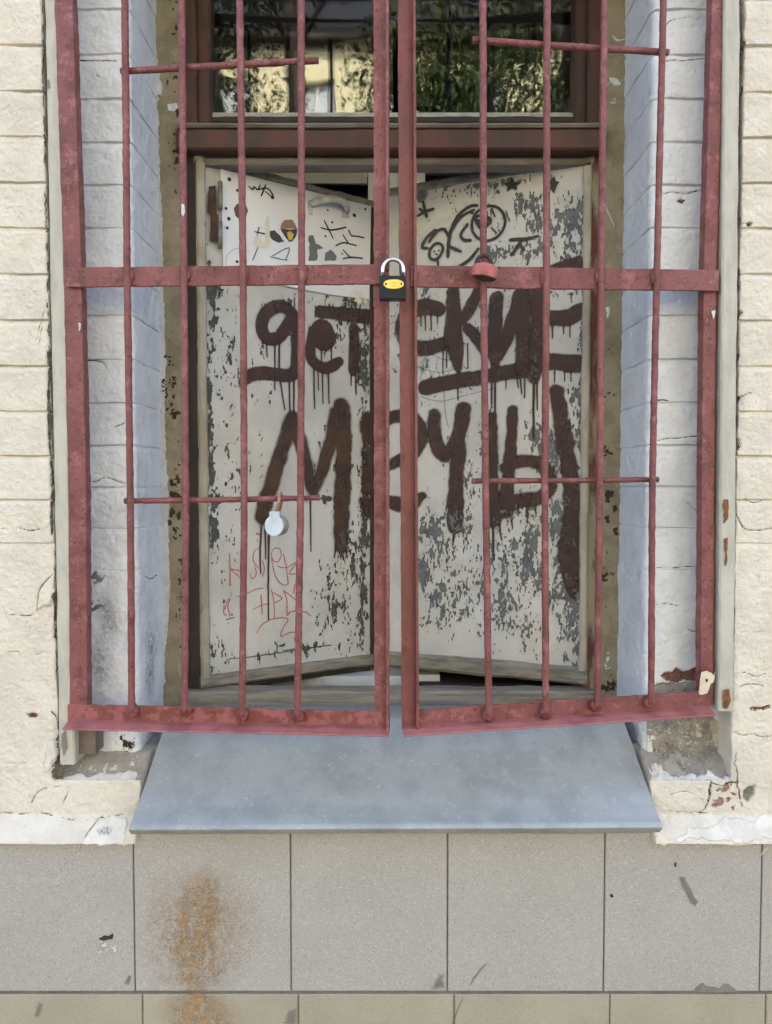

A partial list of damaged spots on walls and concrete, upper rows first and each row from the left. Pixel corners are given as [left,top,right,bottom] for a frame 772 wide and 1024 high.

flaking render [654,667,731,709]
spalling [43,711,140,780]
spalling [647,717,720,776]
spalling [699,753,753,813]
rust [169,884,230,1024]